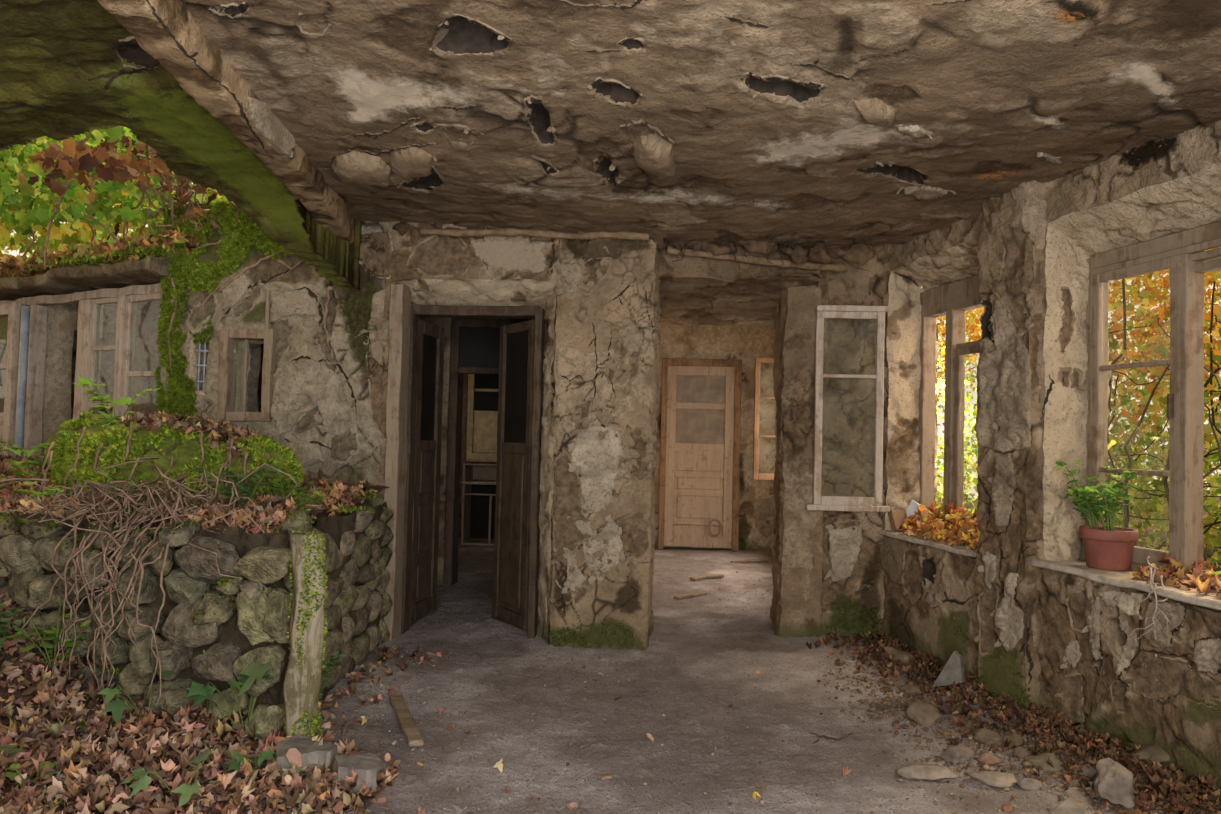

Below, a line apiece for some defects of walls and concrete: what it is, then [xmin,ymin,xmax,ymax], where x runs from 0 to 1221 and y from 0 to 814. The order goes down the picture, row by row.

spalling [429,14,513,56]
spalling [587,77,642,107]
spalling [737,72,824,104]
flaking render [523,94,559,177]
flaking render [593,153,621,187]
peeling [854,161,957,201]
crack [205,264,358,415]
crack [560,278,656,405]
crack [1041,374,1055,420]
crack [283,437,331,450]
peeling [549,397,657,605]
flaking render [1054,585,1221,727]